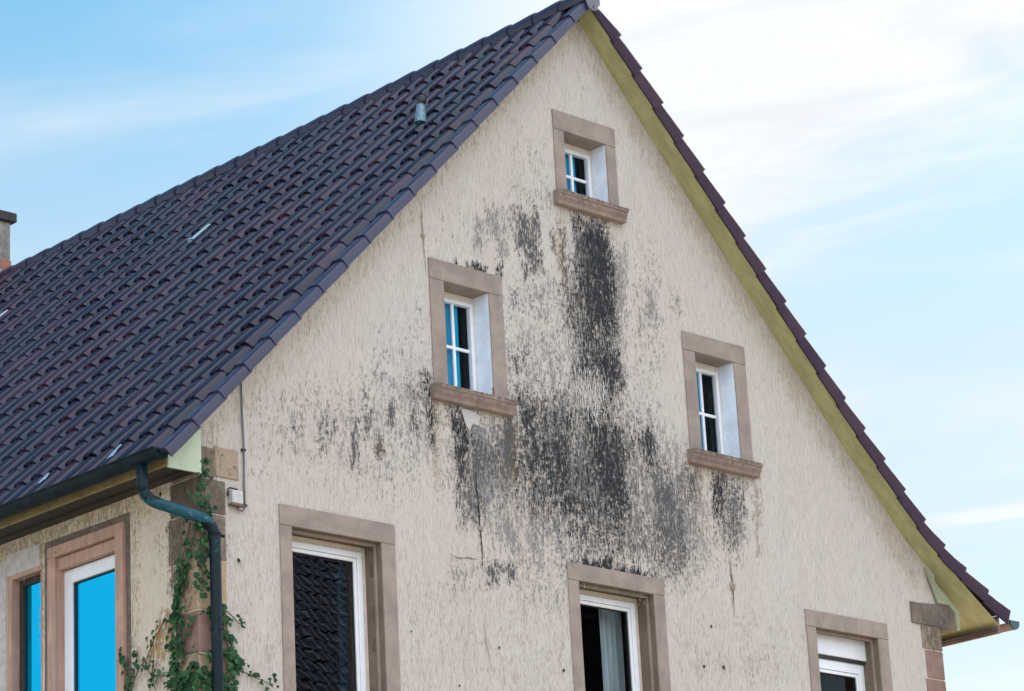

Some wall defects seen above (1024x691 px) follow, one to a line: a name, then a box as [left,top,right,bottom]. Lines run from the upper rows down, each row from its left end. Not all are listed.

crack [452,473,483,566]
leakage [153,28,929,691]